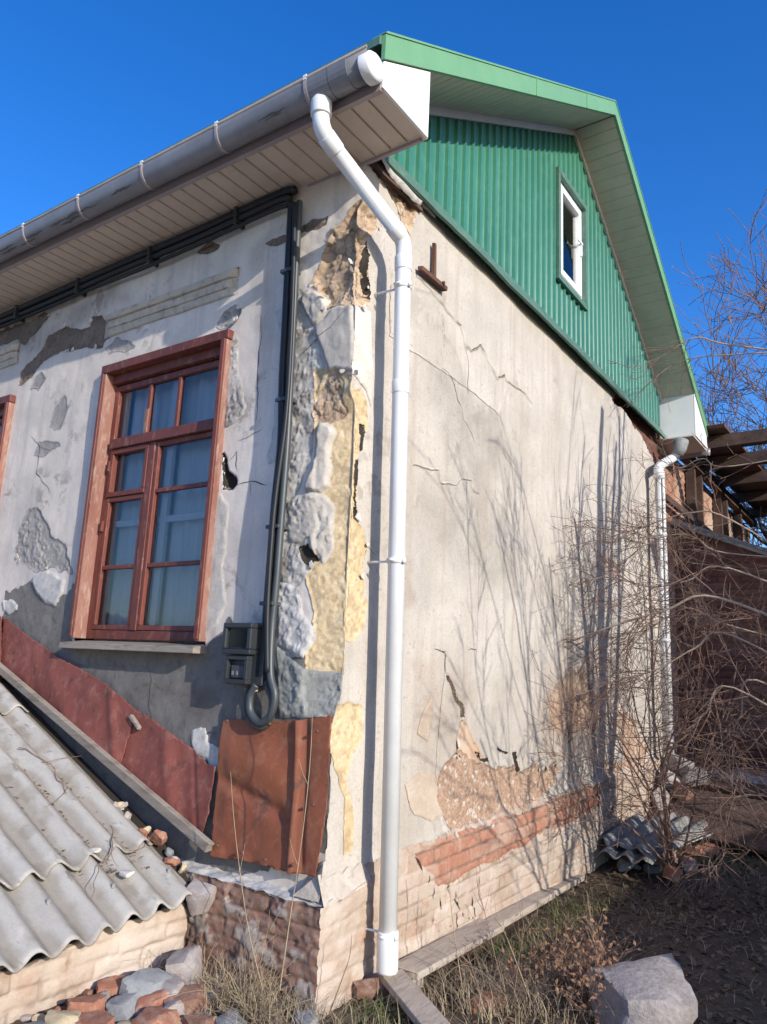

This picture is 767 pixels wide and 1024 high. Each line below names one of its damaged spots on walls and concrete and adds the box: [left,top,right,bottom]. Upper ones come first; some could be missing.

peeling [308,199,383,310]
peeling [30,372,45,390]
peeling [34,395,67,457]
peeling [312,369,359,424]
crack [416,275,533,442]
peeling [14,507,73,575]
flaking render [205,452,238,638]
flaking render [299,544,320,568]
crack [435,648,476,770]
flaking render [437,719,559,838]